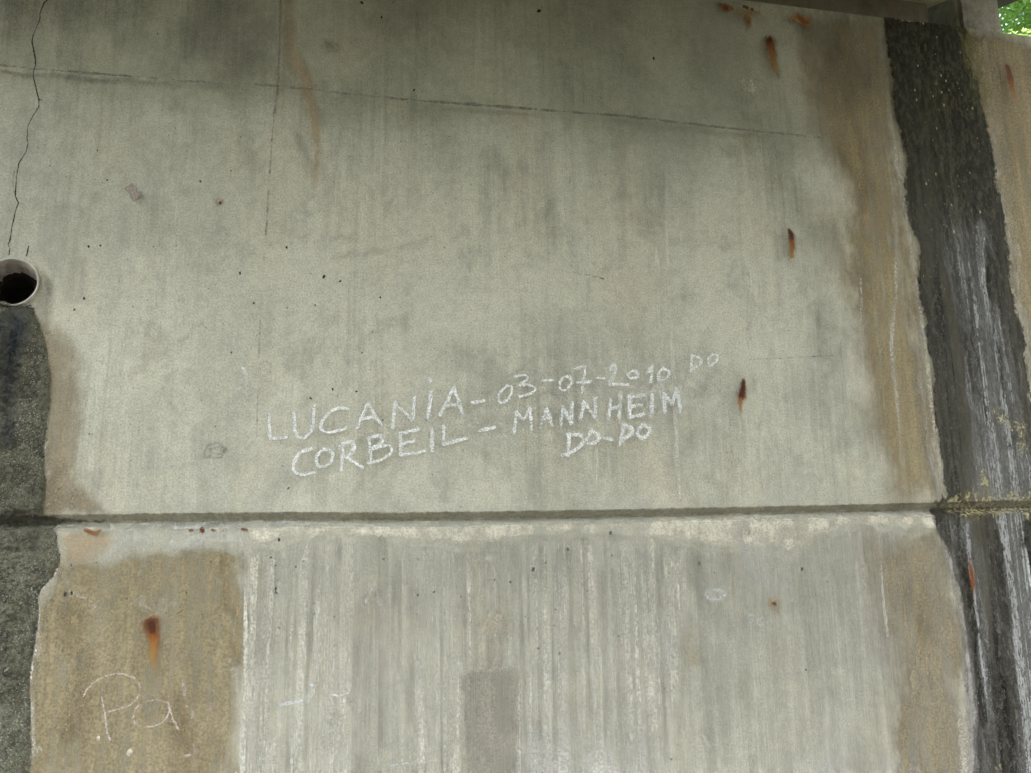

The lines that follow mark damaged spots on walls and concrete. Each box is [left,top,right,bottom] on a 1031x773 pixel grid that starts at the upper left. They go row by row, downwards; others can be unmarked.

crack [8,0,48,257]
corrosion [765,35,779,76]
water stain [802,23,938,498]
water stain [964,31,1031,379]
corrosion [738,378,746,416]
corrosion [143,616,160,671]
water stain [0,281,852,773]
water stain [861,514,968,773]